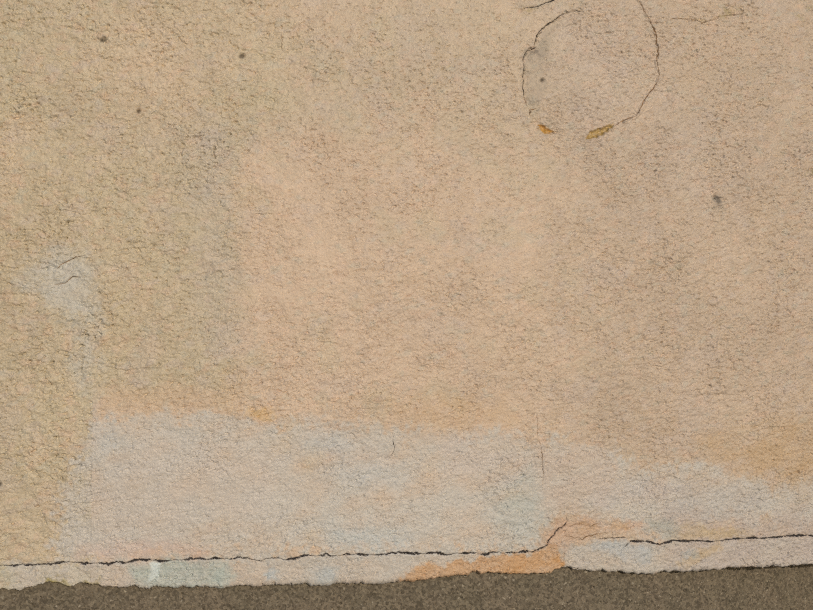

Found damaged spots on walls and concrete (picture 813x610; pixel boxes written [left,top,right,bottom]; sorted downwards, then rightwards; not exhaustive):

crack [522,0,577,115]
crack [615,0,738,126]
spalling [536,124,556,135]
spalling [585,122,615,142]
leakage [0,234,813,591]
crack [0,523,813,567]